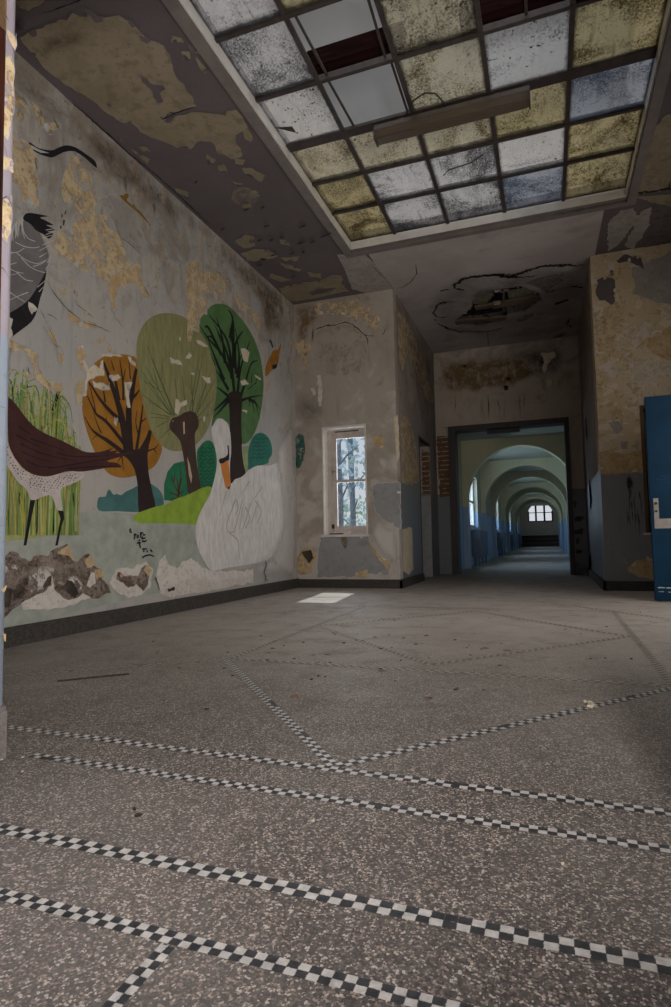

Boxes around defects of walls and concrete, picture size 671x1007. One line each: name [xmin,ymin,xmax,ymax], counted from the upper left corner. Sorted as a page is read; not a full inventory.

peeling [7,0,46,12]
peeling [2,6,265,243]
peeling [53,152,149,312]
peeling [234,233,331,282]
peeling [592,113,671,395]
crack [432,264,588,345]
peeling [599,402,643,475]
spalling [2,544,153,617]